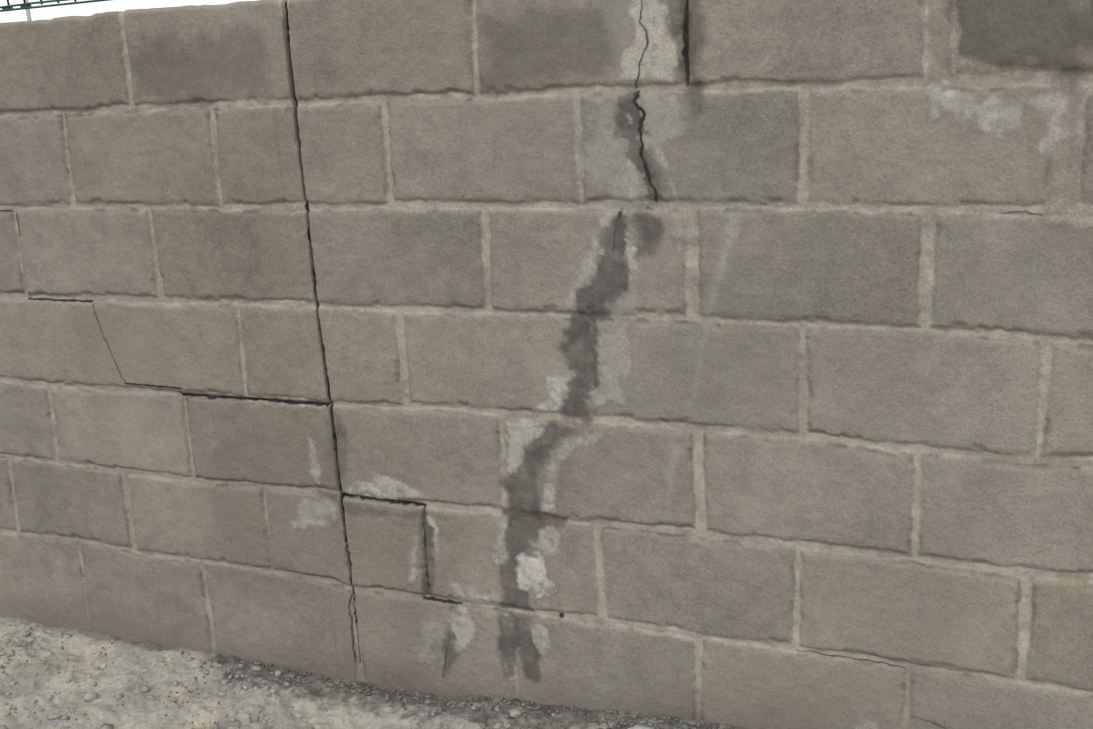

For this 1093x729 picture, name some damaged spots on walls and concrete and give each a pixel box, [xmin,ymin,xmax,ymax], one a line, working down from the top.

crack [285,2,299,130]
crack [633,0,657,201]
crack [681,0,689,86]
damp [927,82,1065,153]
damp [949,0,1076,71]
crack [0,198,462,677]
damp [493,214,661,681]